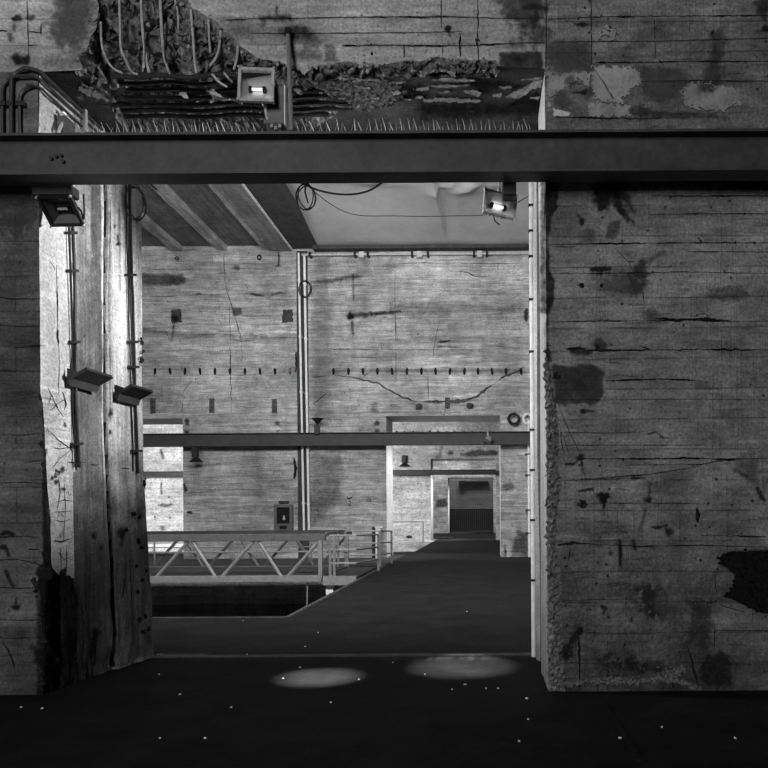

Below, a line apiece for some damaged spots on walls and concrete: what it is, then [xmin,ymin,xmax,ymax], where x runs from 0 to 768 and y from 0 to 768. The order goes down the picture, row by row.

spalling [73,0,641,132]
peeling [679,81,744,113]
damp [592,181,768,232]
damp [540,182,605,413]
damp [628,259,647,293]
crack [548,237,768,322]
crack [313,349,524,415]
crack [557,411,754,480]
spalling [542,350,768,692]